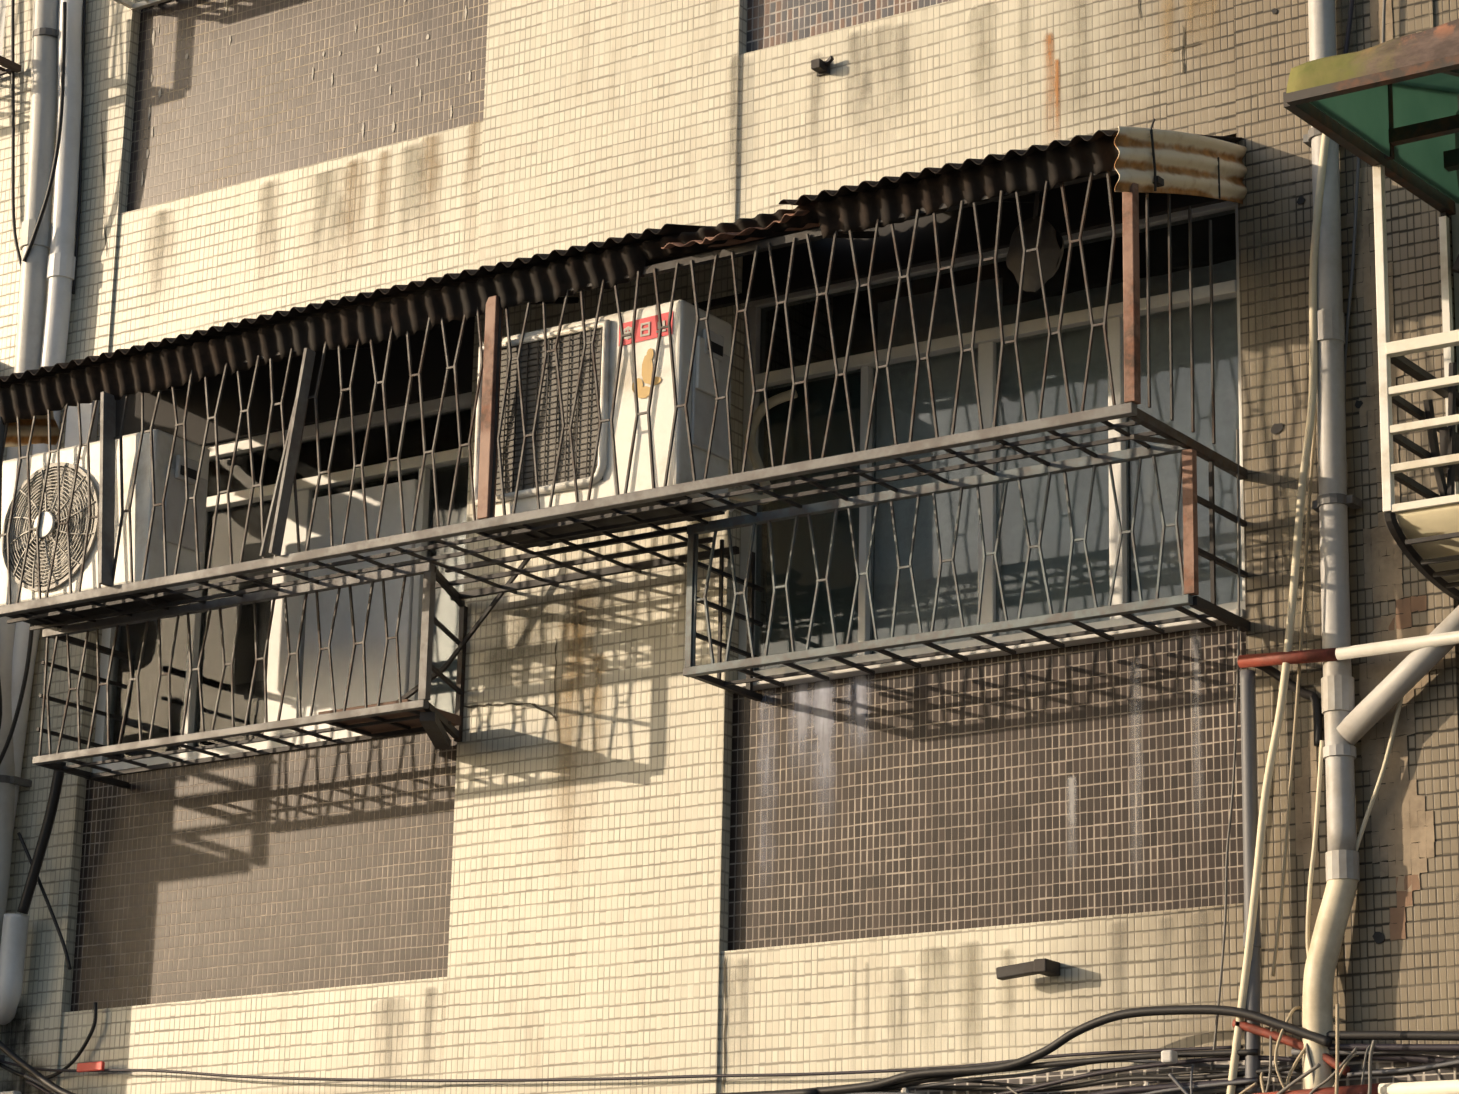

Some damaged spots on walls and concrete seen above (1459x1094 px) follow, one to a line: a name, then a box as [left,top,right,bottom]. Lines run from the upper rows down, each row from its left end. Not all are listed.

rust [1047,35,1059,116]
crack [463,638,557,721]
damp [798,680,833,766]
damp [855,675,866,726]
spalling [1361,657,1444,944]